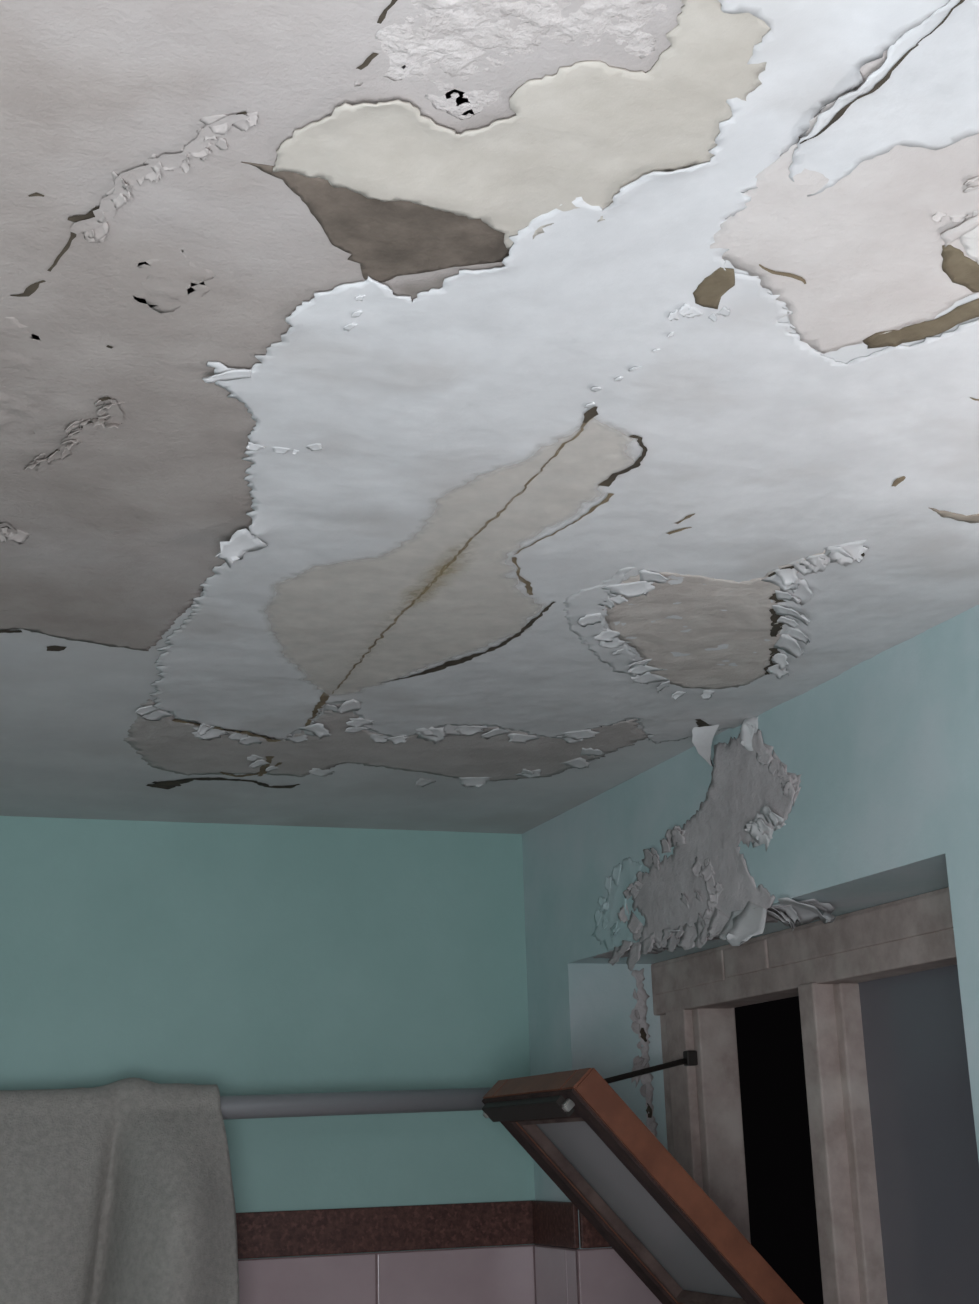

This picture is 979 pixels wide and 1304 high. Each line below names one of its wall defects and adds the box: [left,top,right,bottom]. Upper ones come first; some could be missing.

flaking render [0,0,684,651]
crack [146,406,647,790]
peeling [123,0,979,1071]